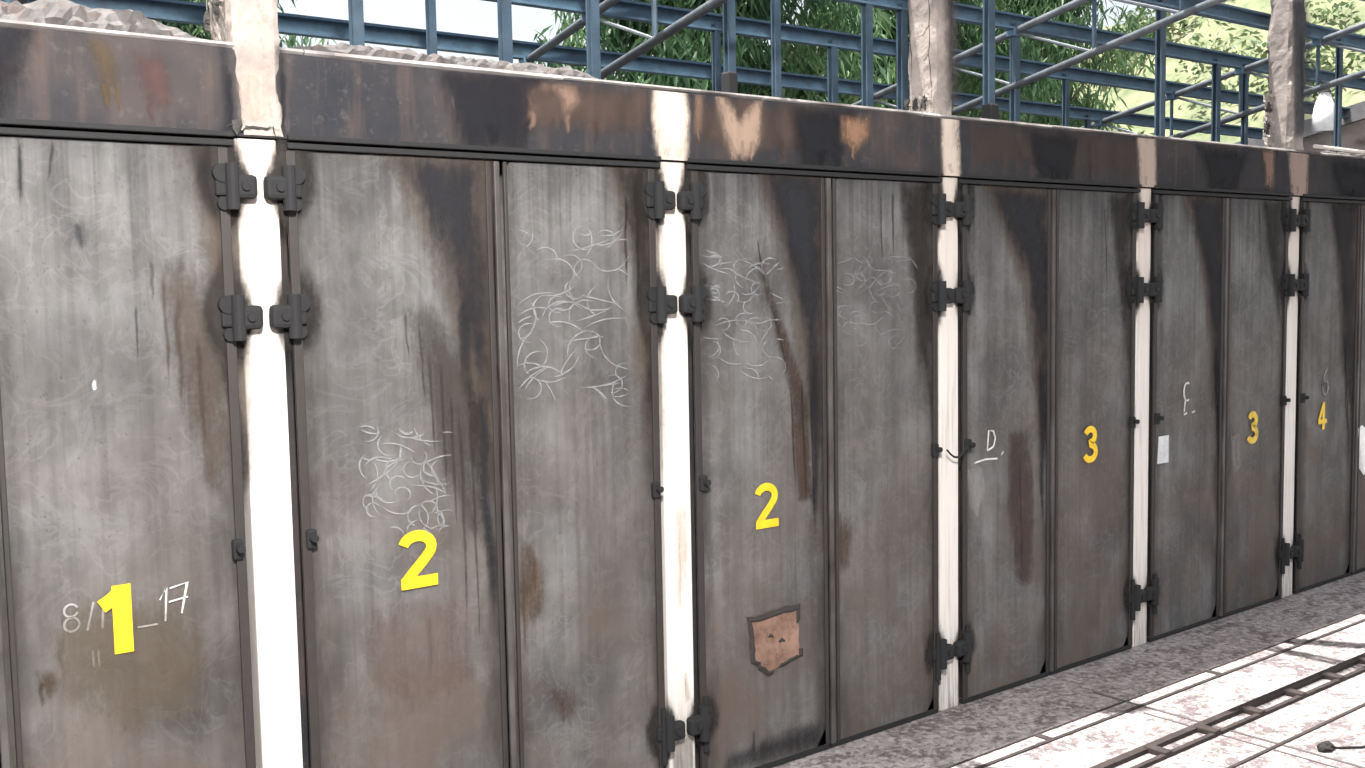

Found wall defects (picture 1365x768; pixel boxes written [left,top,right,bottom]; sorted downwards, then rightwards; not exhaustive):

leakage [758,244,818,511]
corrosion [1011,434,1033,582]